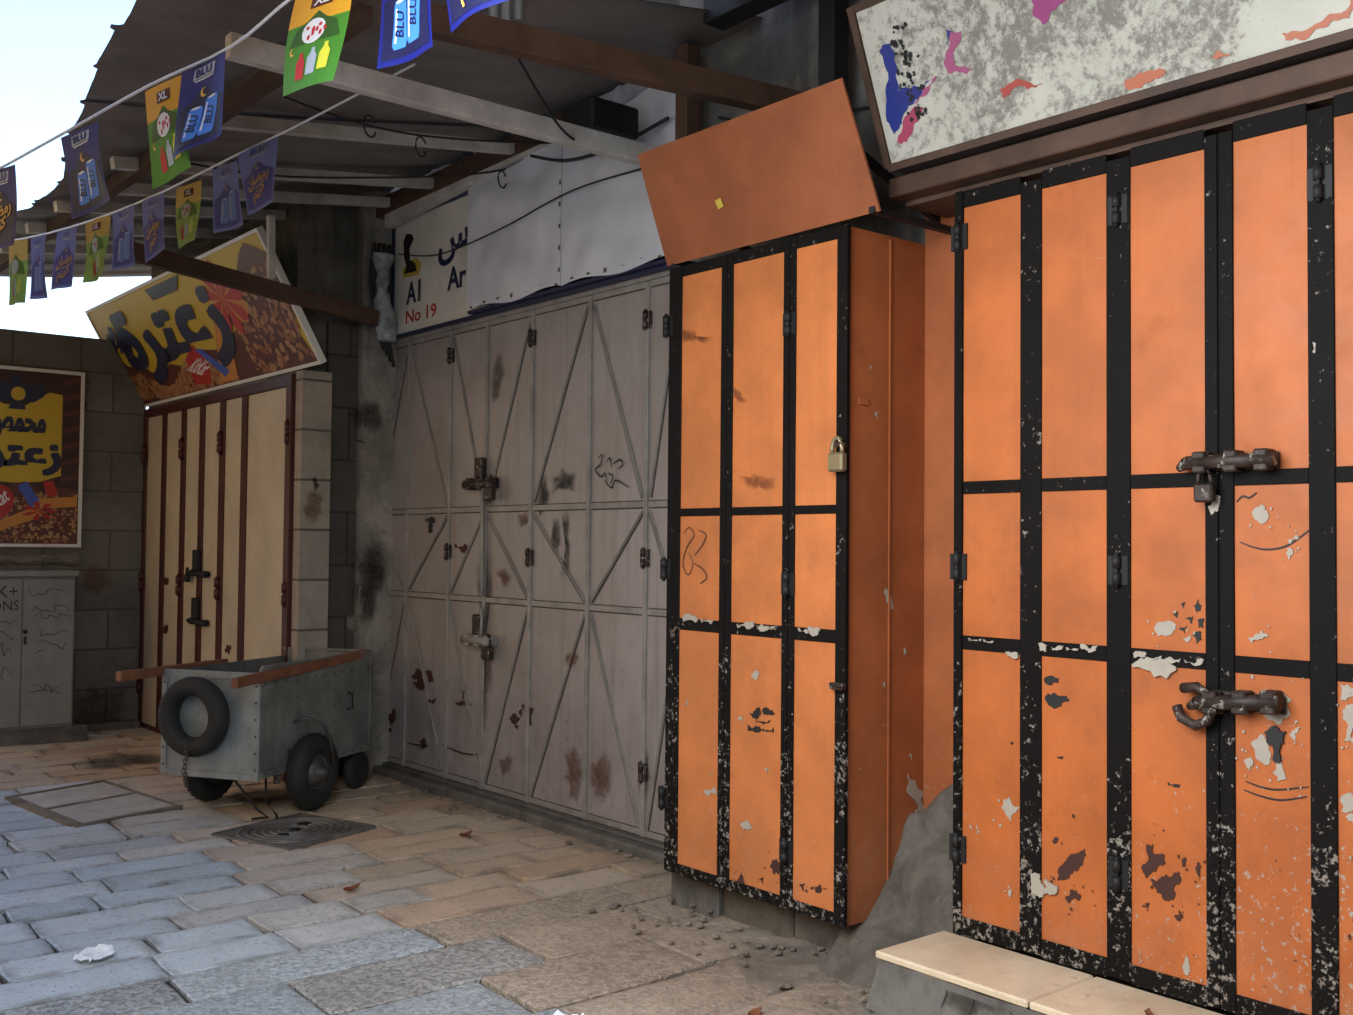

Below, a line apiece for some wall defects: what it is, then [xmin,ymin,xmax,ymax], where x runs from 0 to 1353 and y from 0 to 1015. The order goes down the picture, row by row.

peeling [1249,504,1301,560]
spalling [736,621,778,632]
spalling [1038,642,1099,653]
spalling [1131,599,1204,679]
peeling [737,707,775,733]
peeling [1044,676,1070,709]
peeling [1235,674,1304,790]
peeling [1337,684,1353,749]
corrosion [568,752,609,794]
peeling [1340,791,1353,822]
peeling [1004,837,1096,915]
peeling [1141,829,1206,921]